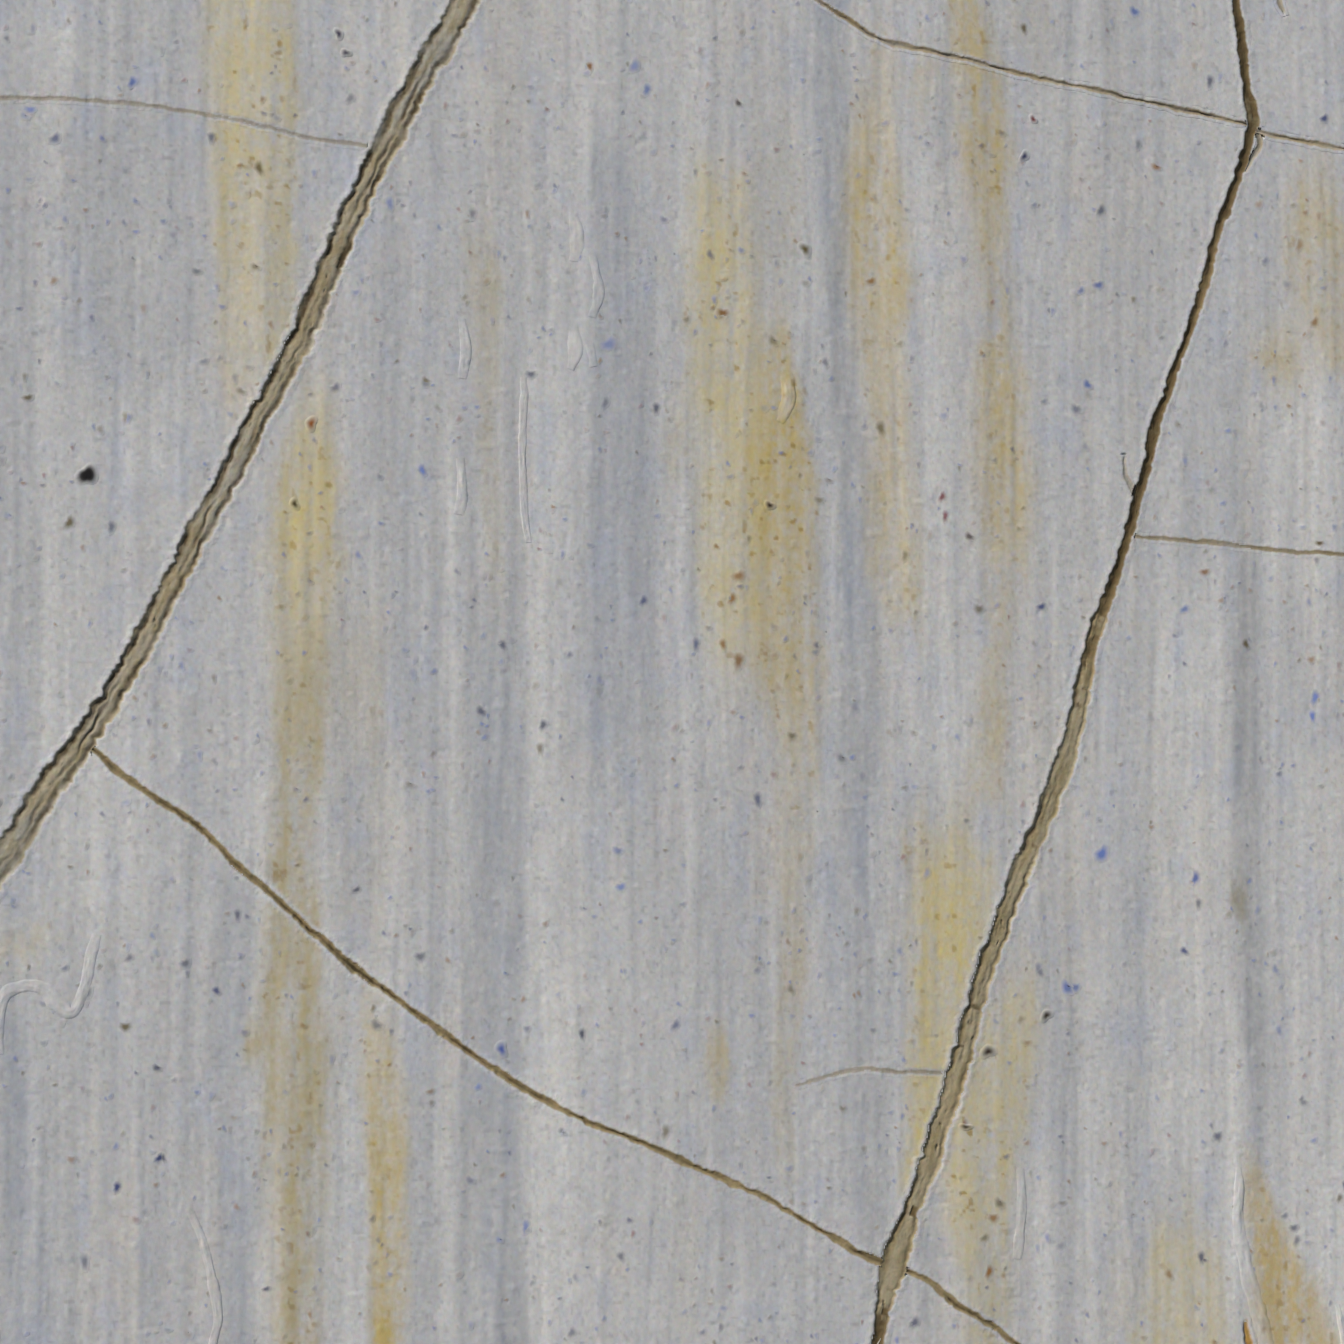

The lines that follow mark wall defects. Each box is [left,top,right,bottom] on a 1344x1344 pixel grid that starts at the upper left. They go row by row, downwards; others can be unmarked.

crack [0,0,883,1271]
crack [791,0,1344,1344]
rust [1238,1123,1341,1344]